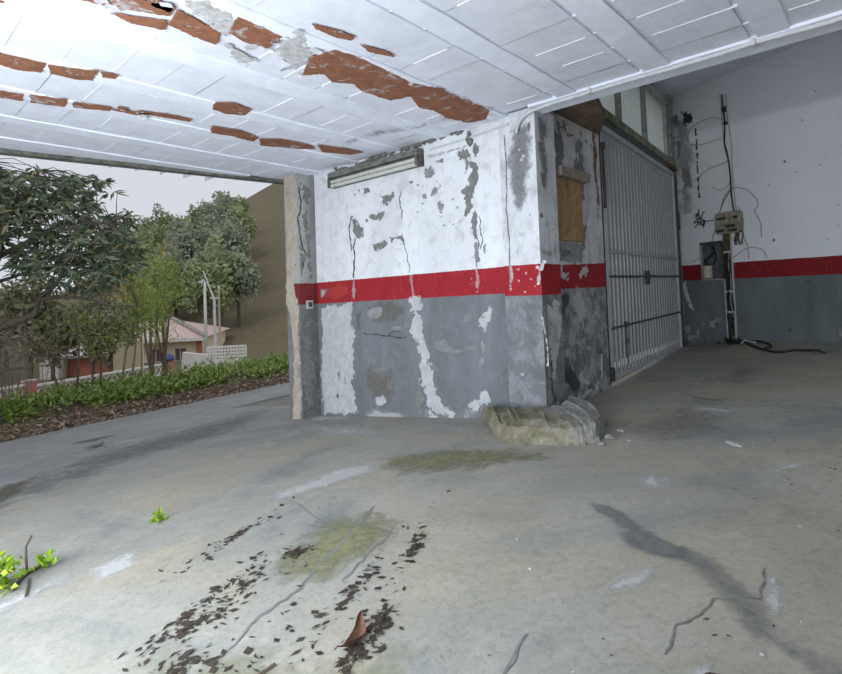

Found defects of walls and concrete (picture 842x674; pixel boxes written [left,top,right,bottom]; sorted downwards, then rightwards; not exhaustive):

peeling [0,52,119,81]
peeling [0,90,192,122]
peeling [82,0,494,293]
peeling [545,119,599,205]
peeling [559,224,589,281]
peeling [320,280,359,416]
crack [363,331,406,339]
flaking render [408,275,456,418]
peeling [478,303,493,379]
flaking render [468,388,491,411]
damp [592,504,763,632]